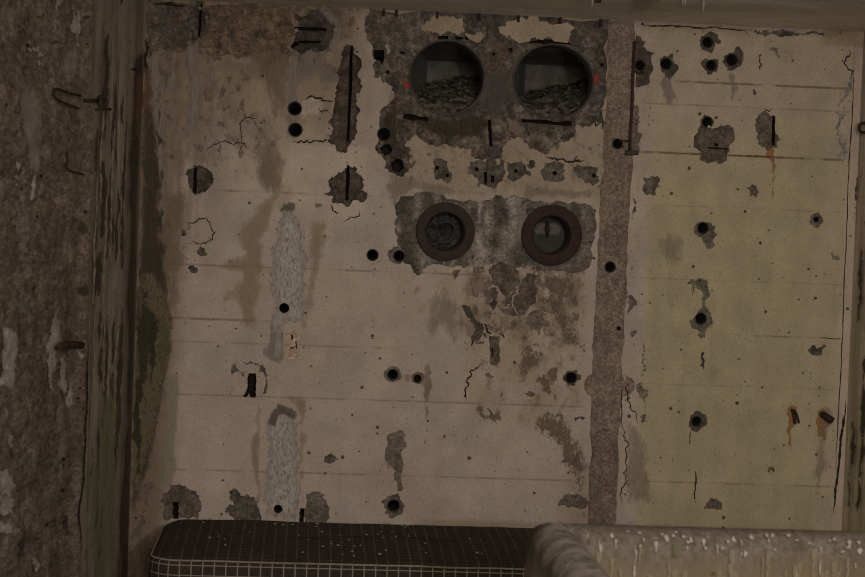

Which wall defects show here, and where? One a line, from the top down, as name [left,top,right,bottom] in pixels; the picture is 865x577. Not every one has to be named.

crack [207,113,258,155]
flaking render [694,114,735,164]
flaking render [185,165,215,196]
flaking render [287,9,609,335]
rust [677,148,803,196]
crack [185,218,216,246]
water stain [121,51,184,577]
crack [504,266,532,316]
flaking render [462,305,501,379]
crack [464,324,505,400]
flaking render [160,484,202,521]